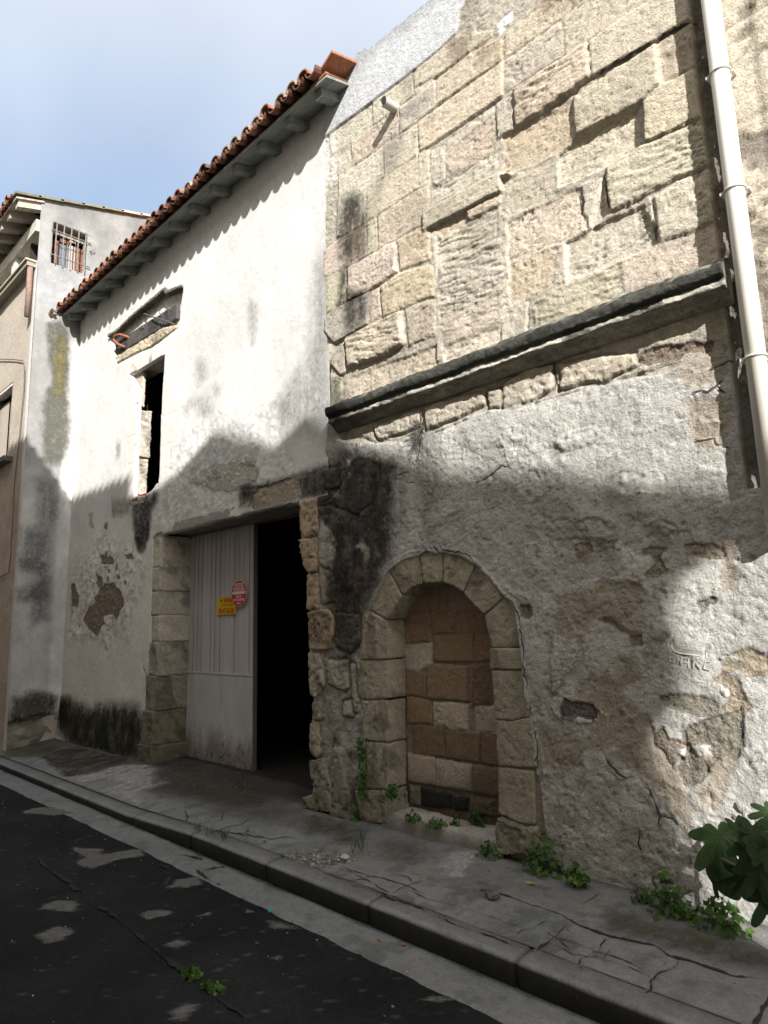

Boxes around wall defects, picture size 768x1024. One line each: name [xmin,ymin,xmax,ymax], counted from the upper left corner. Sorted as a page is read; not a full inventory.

leakage [338,194,368,328]
leakage [44,323,69,462]
flaking render [71,551,133,649]
leakage [112,493,157,550]
flaking render [190,457,302,510]
leakage [239,482,272,507]
leakage [286,451,393,659]
leakage [9,692,142,760]
spalling [549,698,605,724]
spalling [654,647,768,786]
crack [606,758,678,852]
crack [324,867,768,1024]